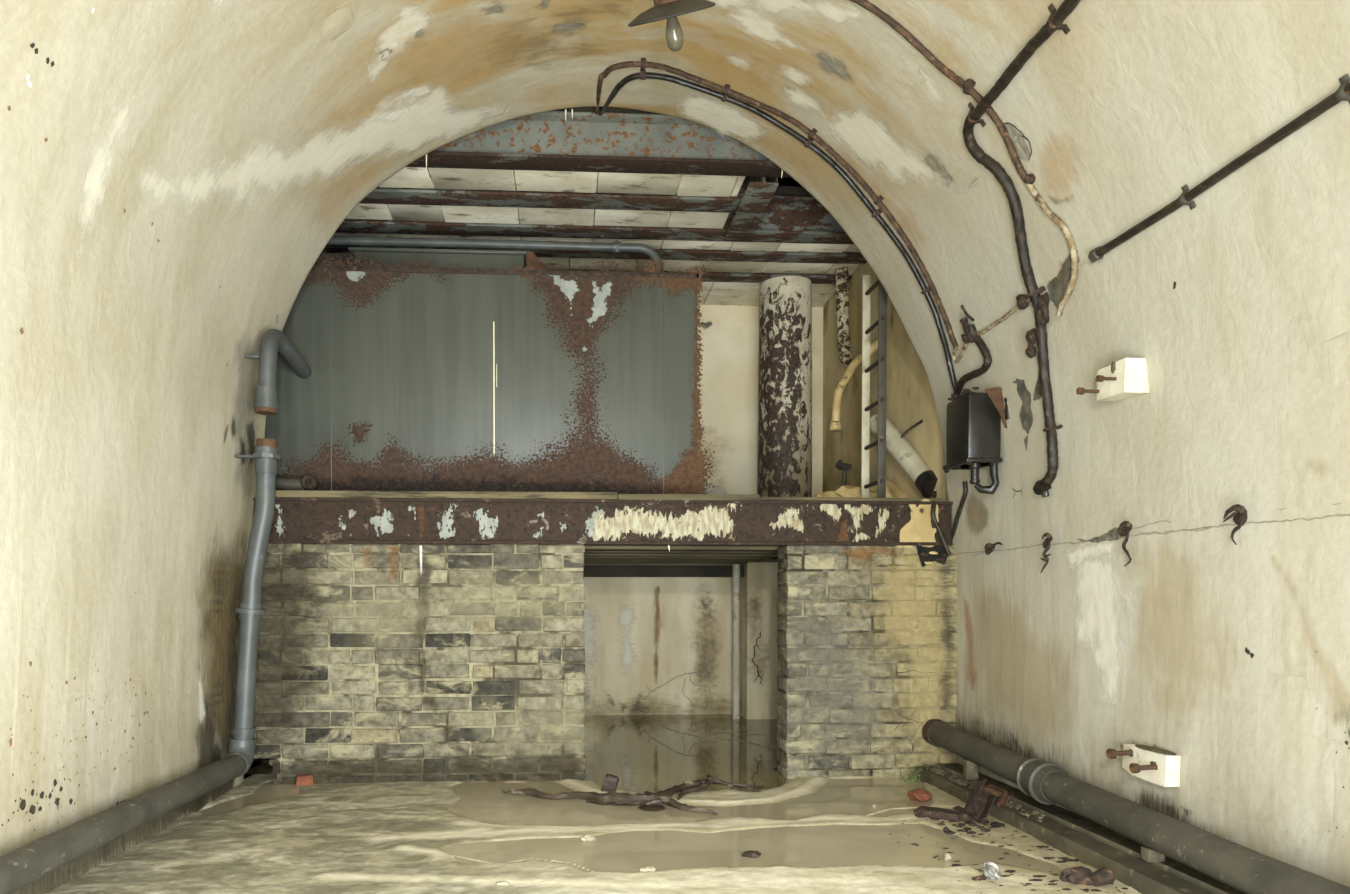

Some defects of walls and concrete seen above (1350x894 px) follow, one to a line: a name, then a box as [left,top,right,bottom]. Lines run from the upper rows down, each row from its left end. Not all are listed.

rust [276,250,718,494]
damp [197,560,243,770]